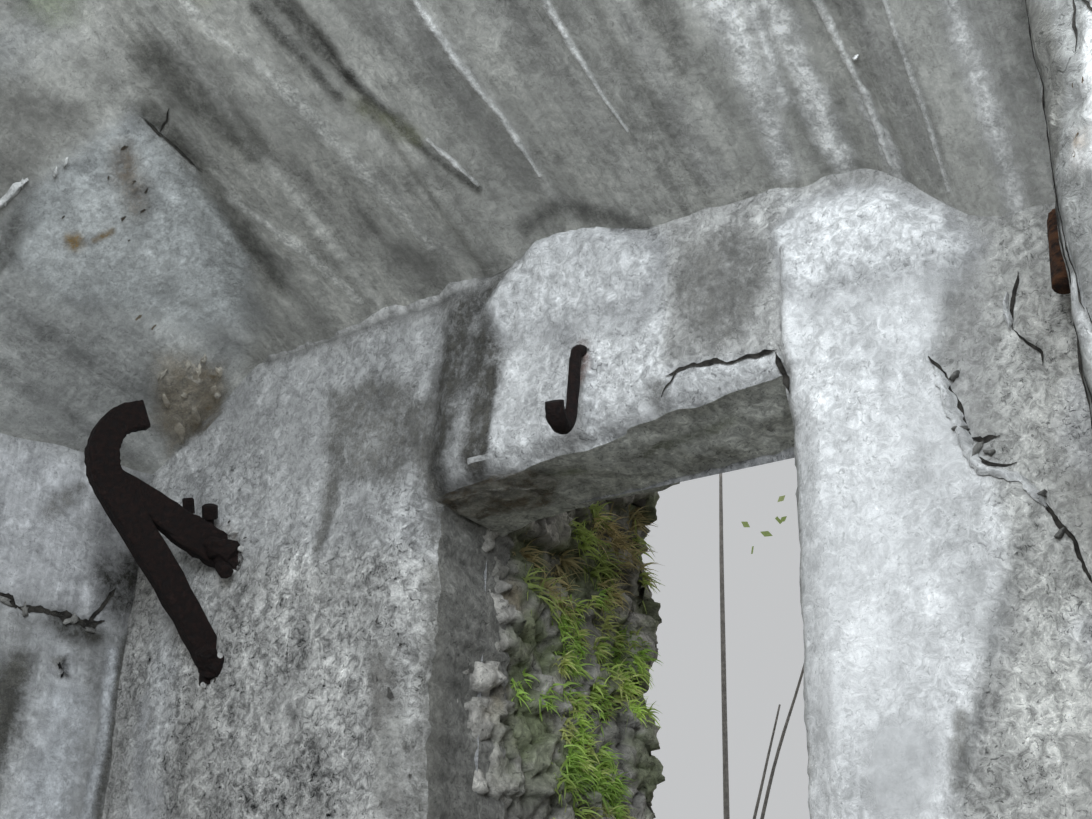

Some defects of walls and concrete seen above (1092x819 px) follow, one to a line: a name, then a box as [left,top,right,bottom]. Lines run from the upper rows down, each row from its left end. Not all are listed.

crack [1025,0,1092,429]
crack [661,349,790,397]
crack [928,356,1092,582]
crack [0,588,116,633]